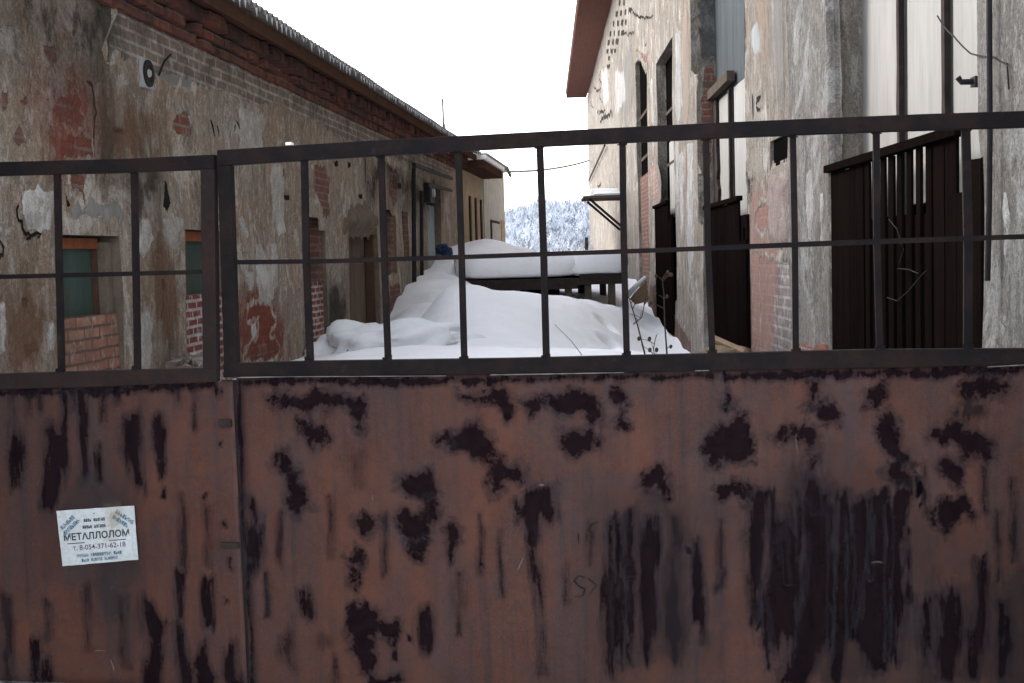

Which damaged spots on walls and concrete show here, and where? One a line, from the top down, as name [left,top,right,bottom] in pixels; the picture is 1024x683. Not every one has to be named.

spalling [100,8,399,149]
crack [0,204,42,260]
peeling [22,174,124,233]
peeling [238,164,291,362]
spalling [648,152,662,215]
spalling [746,157,828,352]
corrosion [142,383,309,683]
corrosion [345,468,462,683]
corrosion [435,422,559,603]
corrosion [458,385,634,459]
corrosion [600,508,727,680]
corrosion [716,375,1017,683]